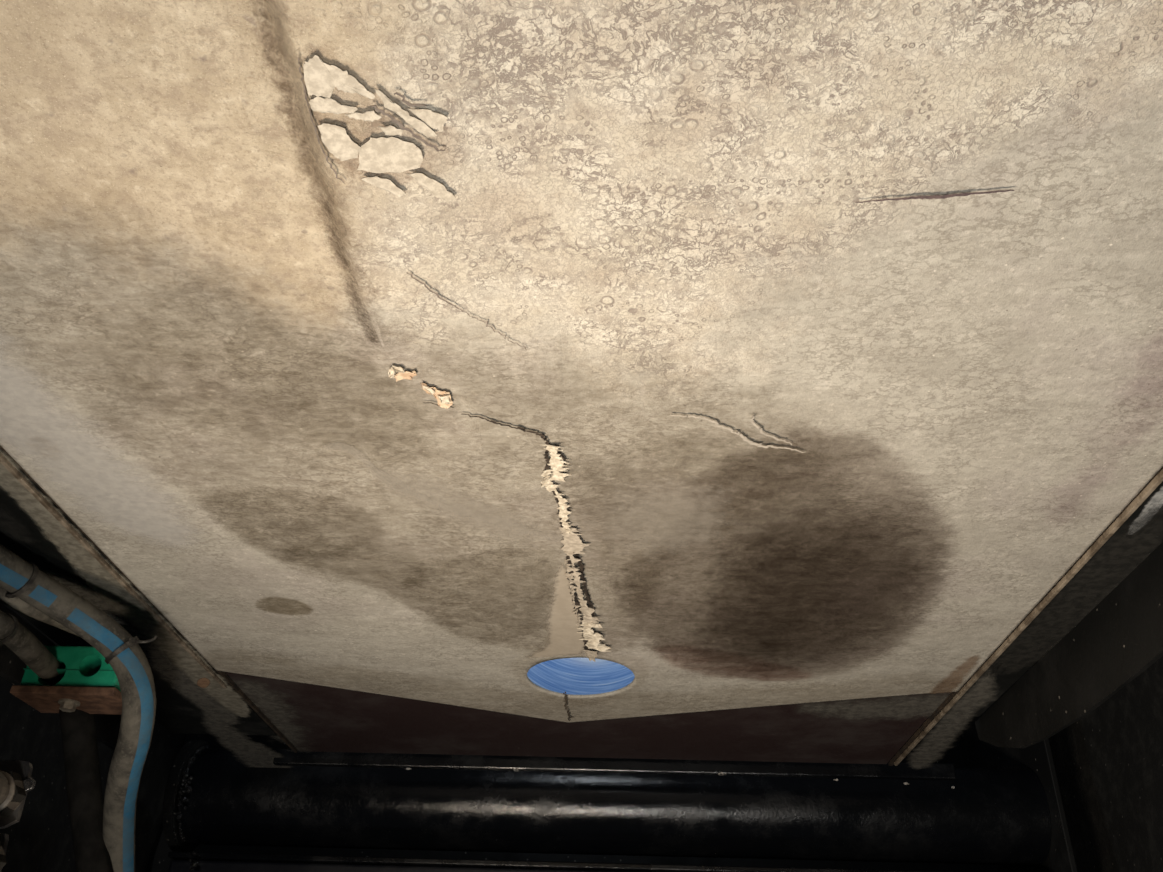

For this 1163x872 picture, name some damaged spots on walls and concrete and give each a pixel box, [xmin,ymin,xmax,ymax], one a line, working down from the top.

peeling [298,55,456,202]
crack [407,273,526,349]
peeling [388,365,453,409]
crack [670,415,805,453]
crack [424,402,611,662]
leakage [0,452,301,768]
leakage [805,487,1163,769]
crack [563,692,573,721]